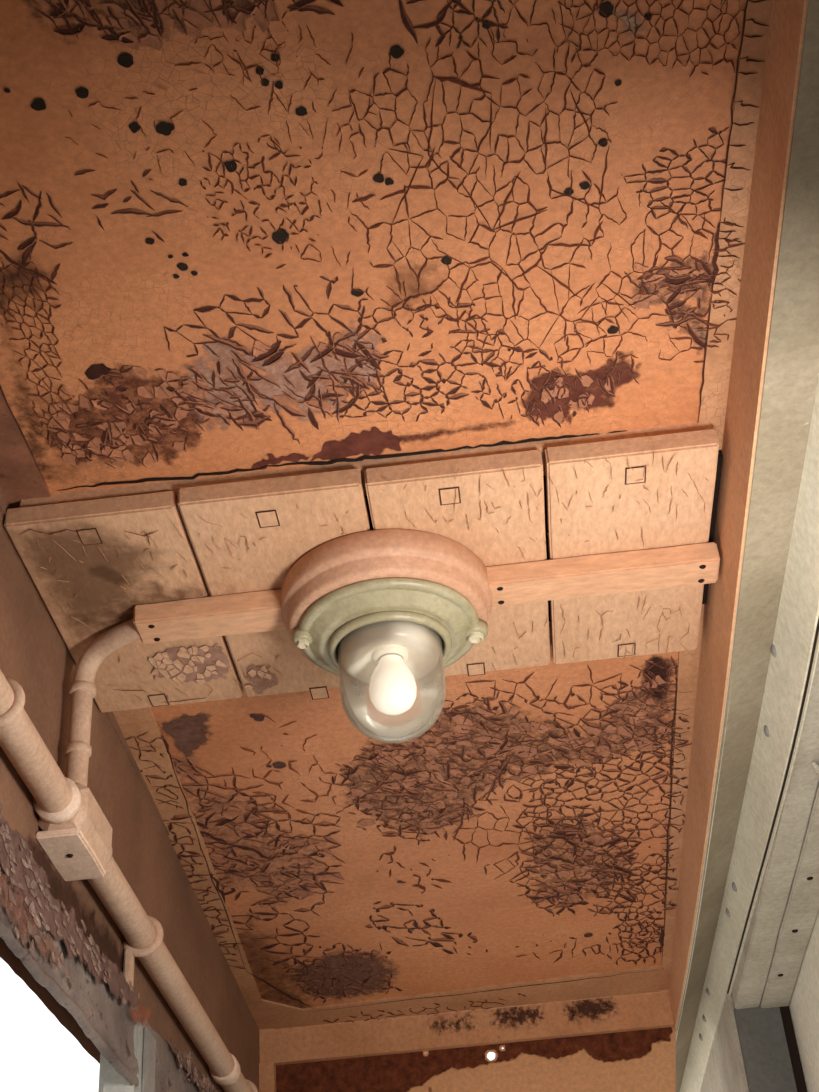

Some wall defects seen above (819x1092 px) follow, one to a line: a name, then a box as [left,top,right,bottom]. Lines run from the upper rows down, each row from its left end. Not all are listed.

peeling [23,0,280,68]
peeling [624,256,714,348]
peeling [47,321,389,468]
peeling [525,351,640,427]
crack [19,514,265,627]
peeling [340,656,678,839]
peeling [0,803,140,1006]
peeling [171,755,343,908]
crack [108,595,693,1023]
peeling [521,814,638,908]
peeling [169,1039,218,1092]
peeling [433,1015,471,1030]